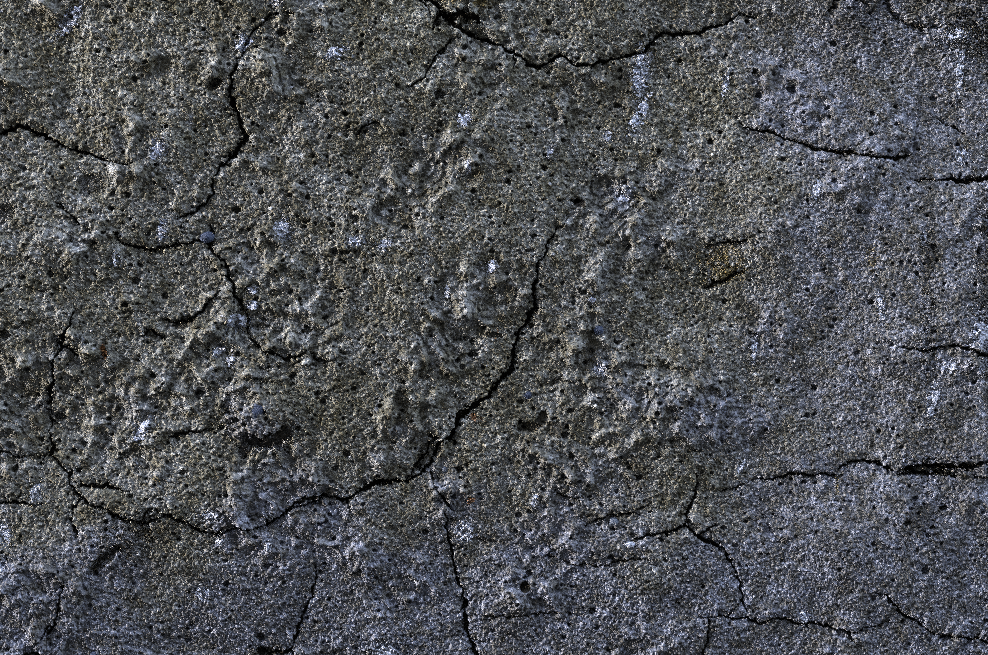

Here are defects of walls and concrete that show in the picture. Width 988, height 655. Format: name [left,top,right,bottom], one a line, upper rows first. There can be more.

crack [410,0,756,87]
crack [0,123,129,167]
crack [58,11,337,362]
crack [739,122,920,161]
crack [918,175,988,185]
crack [0,226,587,655]
crack [722,457,983,491]
crack [549,470,988,655]